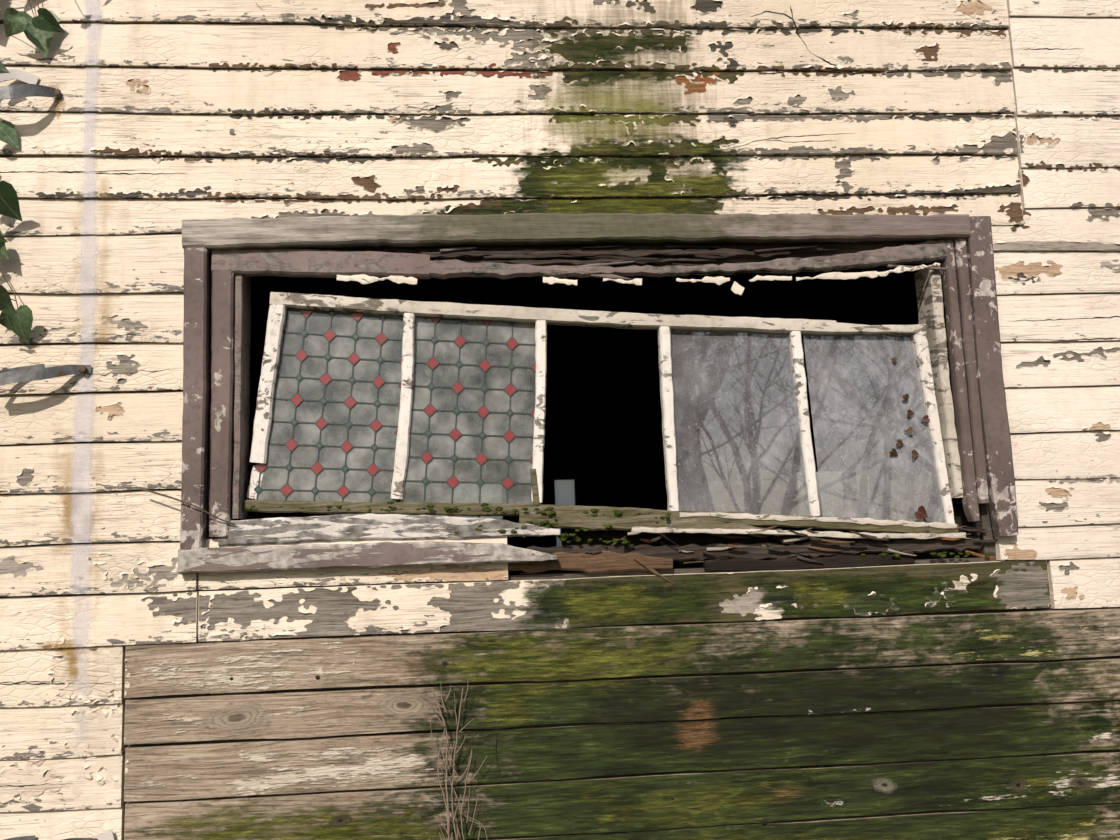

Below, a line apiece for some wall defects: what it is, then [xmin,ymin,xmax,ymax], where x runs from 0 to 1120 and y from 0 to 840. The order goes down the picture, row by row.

crack [751,5,836,66]
water stain [562,21,694,172]
peeling [36,0,1120,286]
peeling [676,262,940,295]
peeling [104,351,140,384]
peeling [1015,346,1120,368]
peeling [0,466,34,494]
peeling [0,555,44,577]
peeling [87,551,566,641]
water stain [744,573,1002,617]
peeling [1058,561,1085,600]
peeling [0,637,130,804]